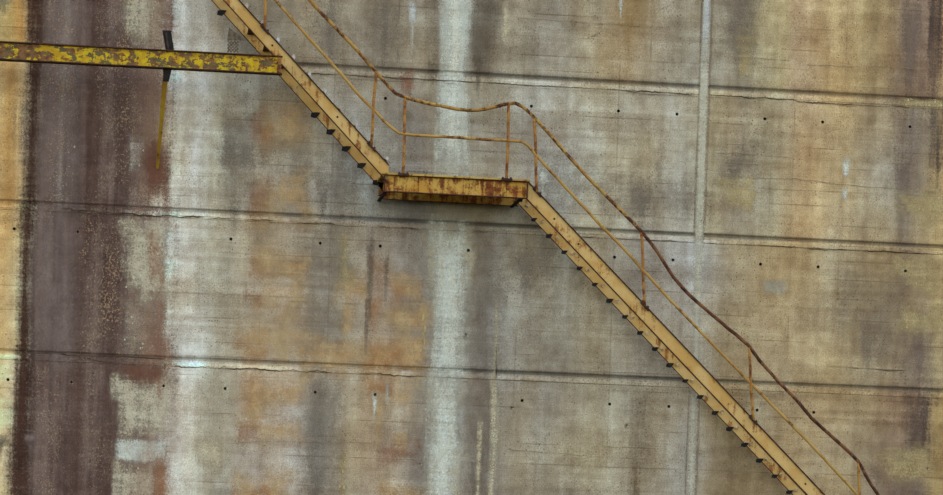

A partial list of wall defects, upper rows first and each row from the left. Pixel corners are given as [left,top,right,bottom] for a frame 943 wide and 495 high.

damp [929,0,943,95]
rust [141,143,170,188]
crack [307,55,941,257]
crack [64,207,497,232]
crack [27,352,415,377]
rust [306,307,429,376]